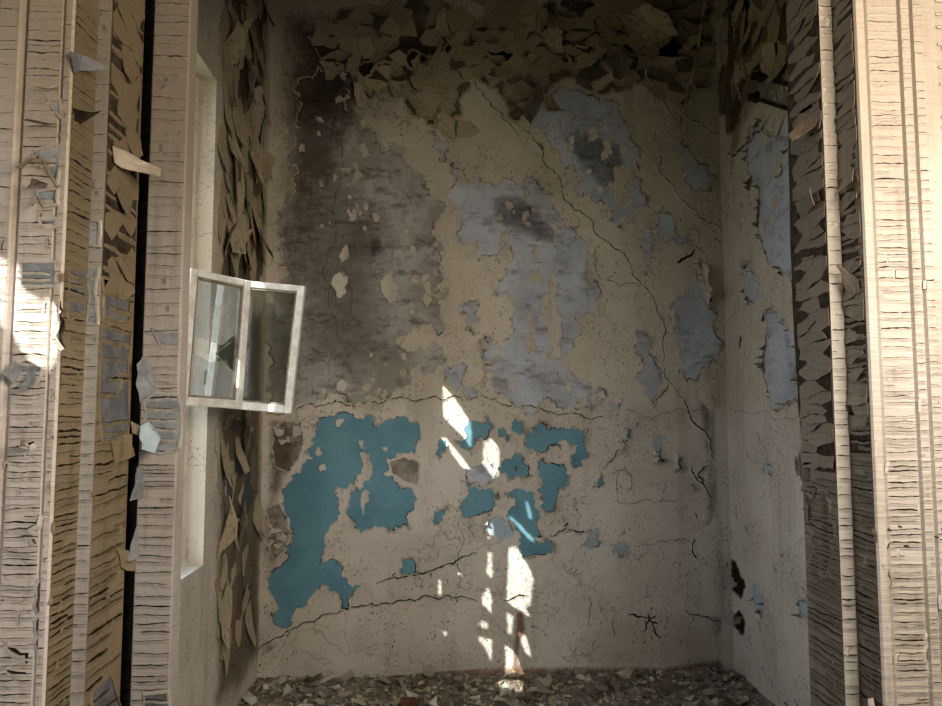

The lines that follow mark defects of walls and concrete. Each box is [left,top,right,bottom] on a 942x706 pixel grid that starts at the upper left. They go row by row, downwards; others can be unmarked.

peeling [73,108,101,124]
water stain [293,22,341,202]
peeling [112,146,161,177]
peeling [89,219,102,248]
peeling [213,0,823,676]
crack [458,61,714,568]
peeling [66,265,183,501]
crack [265,342,603,421]
peeling [115,528,139,571]
crack [258,523,477,651]
crack [504,594,529,603]
crack [588,598,661,639]